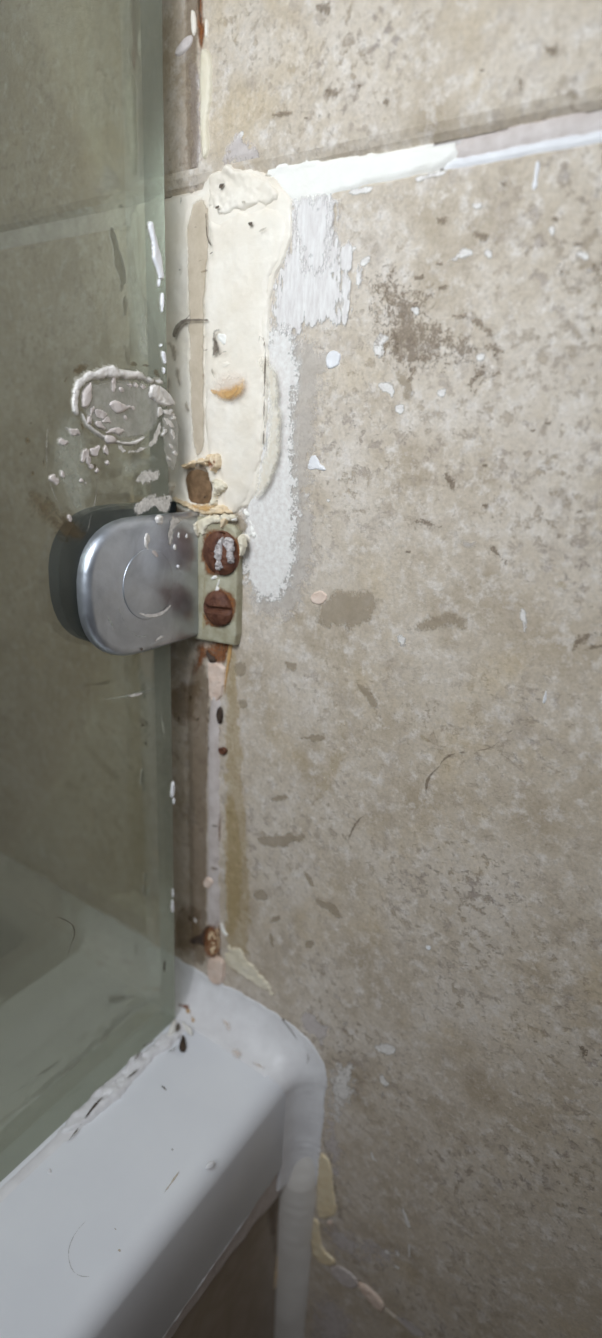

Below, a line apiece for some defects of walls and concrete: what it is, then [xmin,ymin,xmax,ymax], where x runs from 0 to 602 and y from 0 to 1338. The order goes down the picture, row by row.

corrosion [202,530,240,617]
corrosion [202,614,232,683]
corrosion [190,925,221,957]